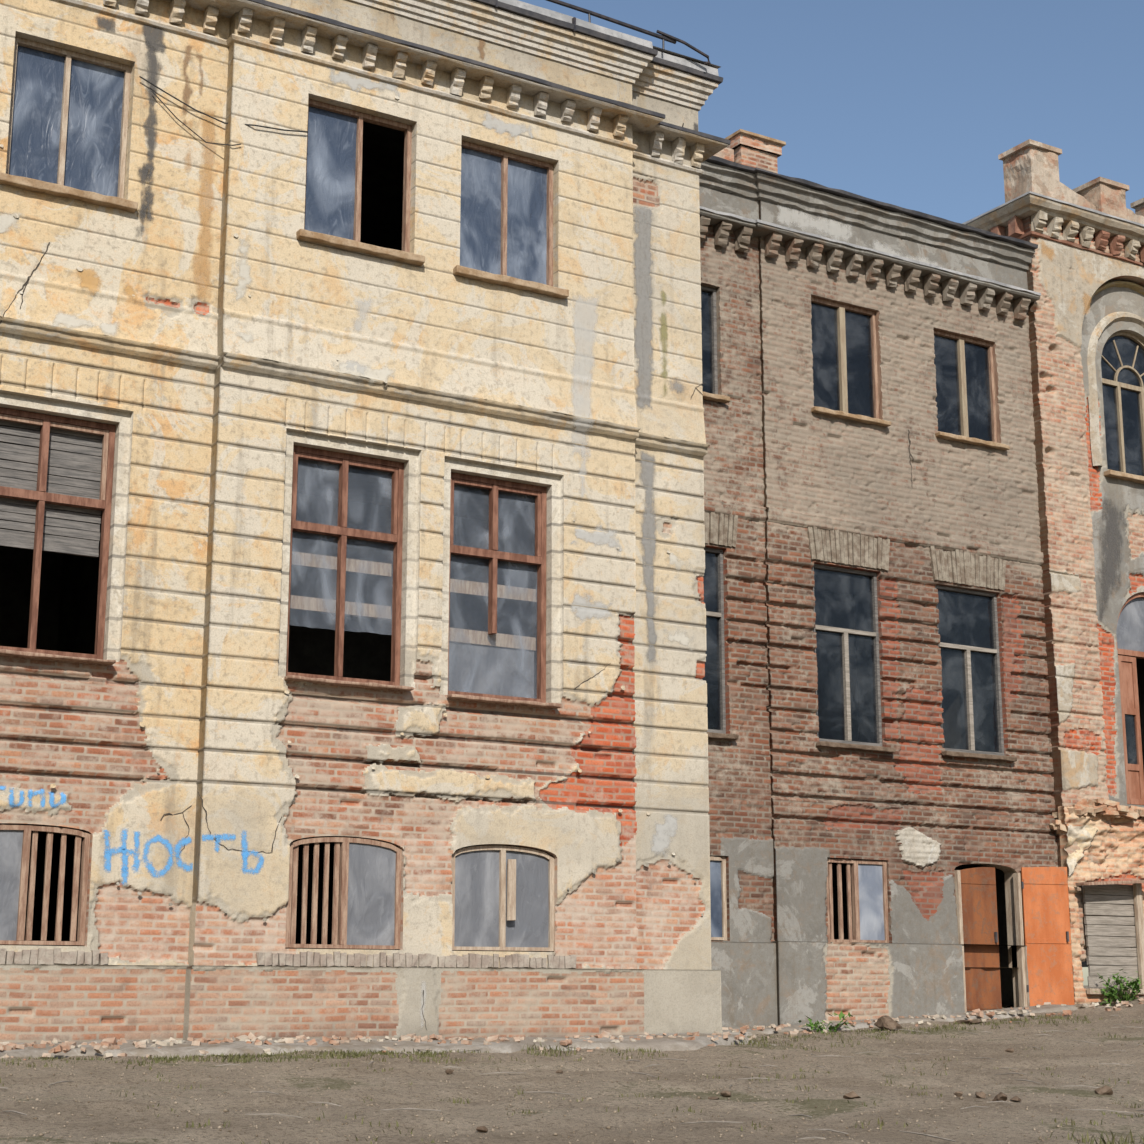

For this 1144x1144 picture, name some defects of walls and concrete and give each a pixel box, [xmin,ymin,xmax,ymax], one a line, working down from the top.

water stain [139,43,161,229]
peeling [0,213,20,233]
crack [0,242,50,323]
peeling [54,313,117,335]
peeling [571,520,622,551]
flaking render [0,657,170,834]
flaking render [276,594,705,1040]
spalling [1086,870,1144,890]